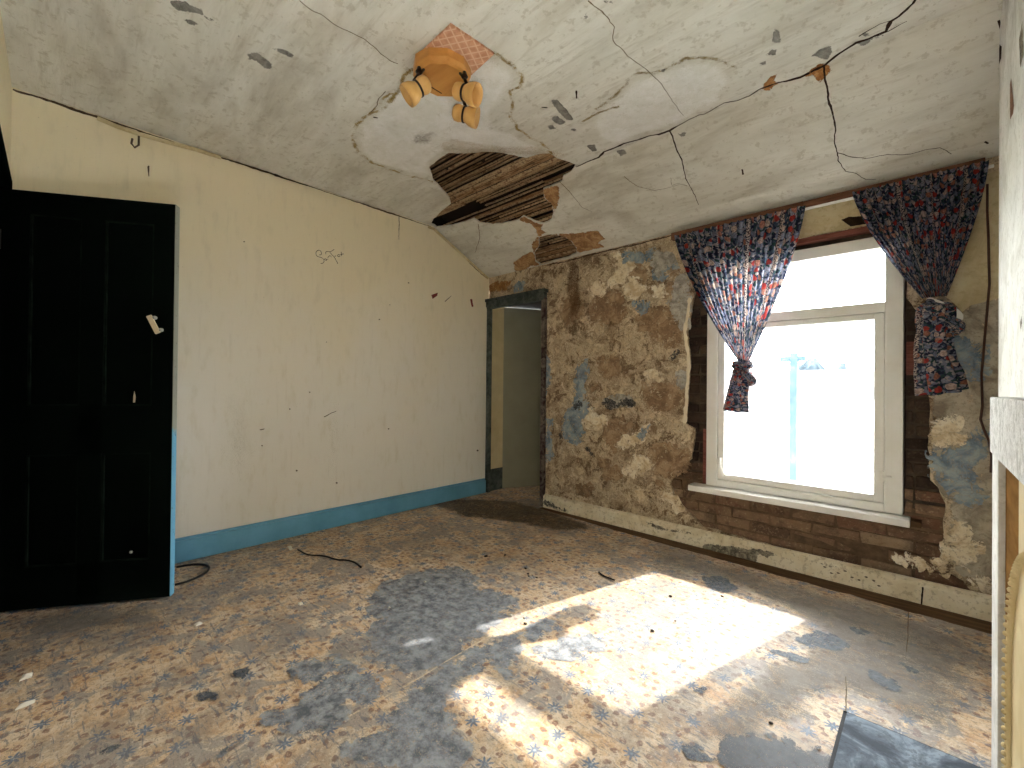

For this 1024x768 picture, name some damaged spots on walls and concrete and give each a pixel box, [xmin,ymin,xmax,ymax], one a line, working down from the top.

crack [299,0,398,64]
water stain [350,53,560,182]
crack [560,0,951,210]
flaking render [430,152,605,271]
flaking render [559,171,999,590]